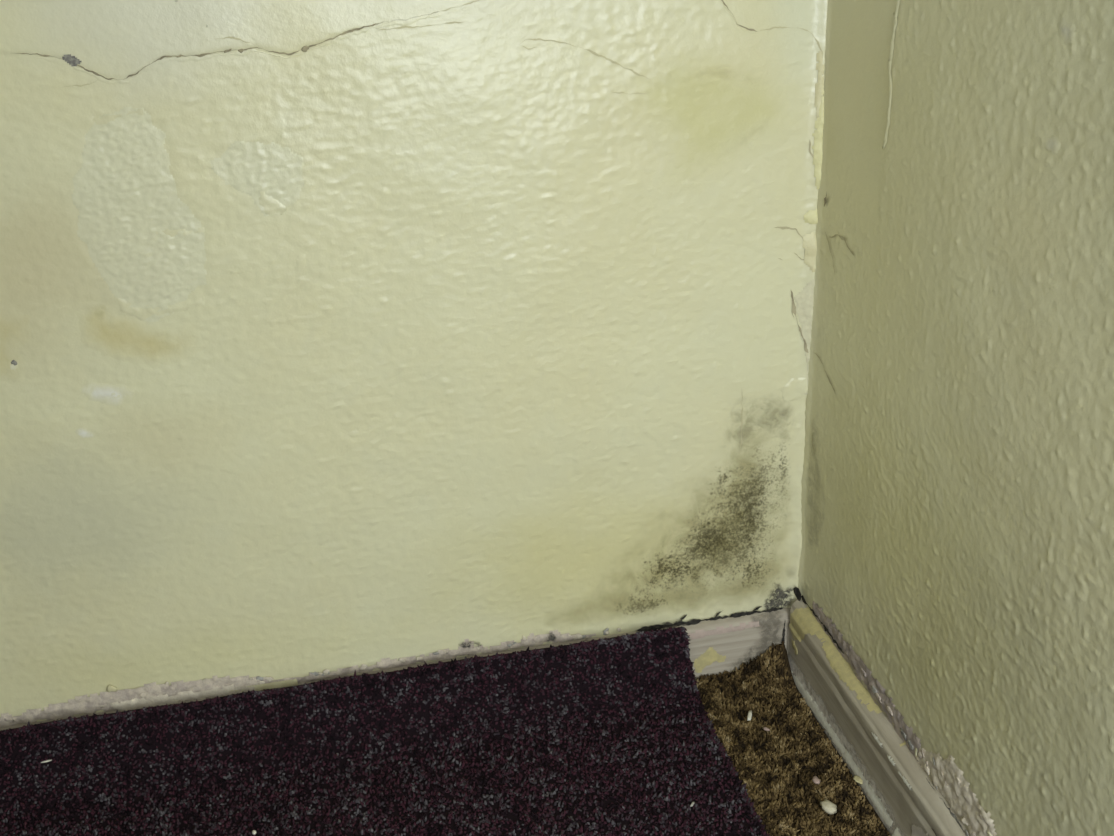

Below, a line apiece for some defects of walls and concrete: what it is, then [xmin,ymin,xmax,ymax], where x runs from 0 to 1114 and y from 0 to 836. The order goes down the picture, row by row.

crack [16,0,479,87]
crack [519,38,650,94]
crack [718,0,823,58]
crack [775,193,854,275]
crack [791,291,835,393]
water stain [765,585,792,610]
spalling [788,601,997,836]